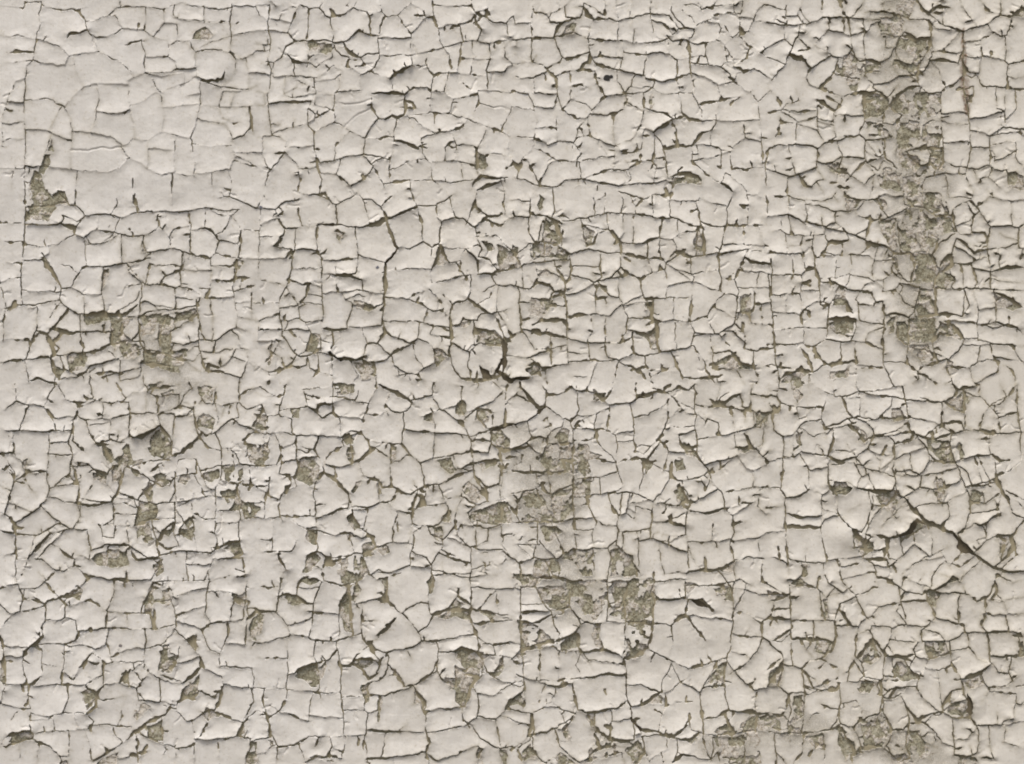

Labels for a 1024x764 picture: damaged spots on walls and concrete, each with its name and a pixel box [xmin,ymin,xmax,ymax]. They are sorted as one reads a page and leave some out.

crack [4,25,80,112]
peeling [24,130,84,225]
crack [21,1,196,100]
crack [198,71,248,112]
crack [191,1,282,68]
crack [362,56,458,139]
crack [376,83,494,164]
crack [703,144,753,192]
crack [905,127,1024,190]
peeling [791,0,1024,484]
peeling [15,208,1024,764]
crack [377,617,397,638]